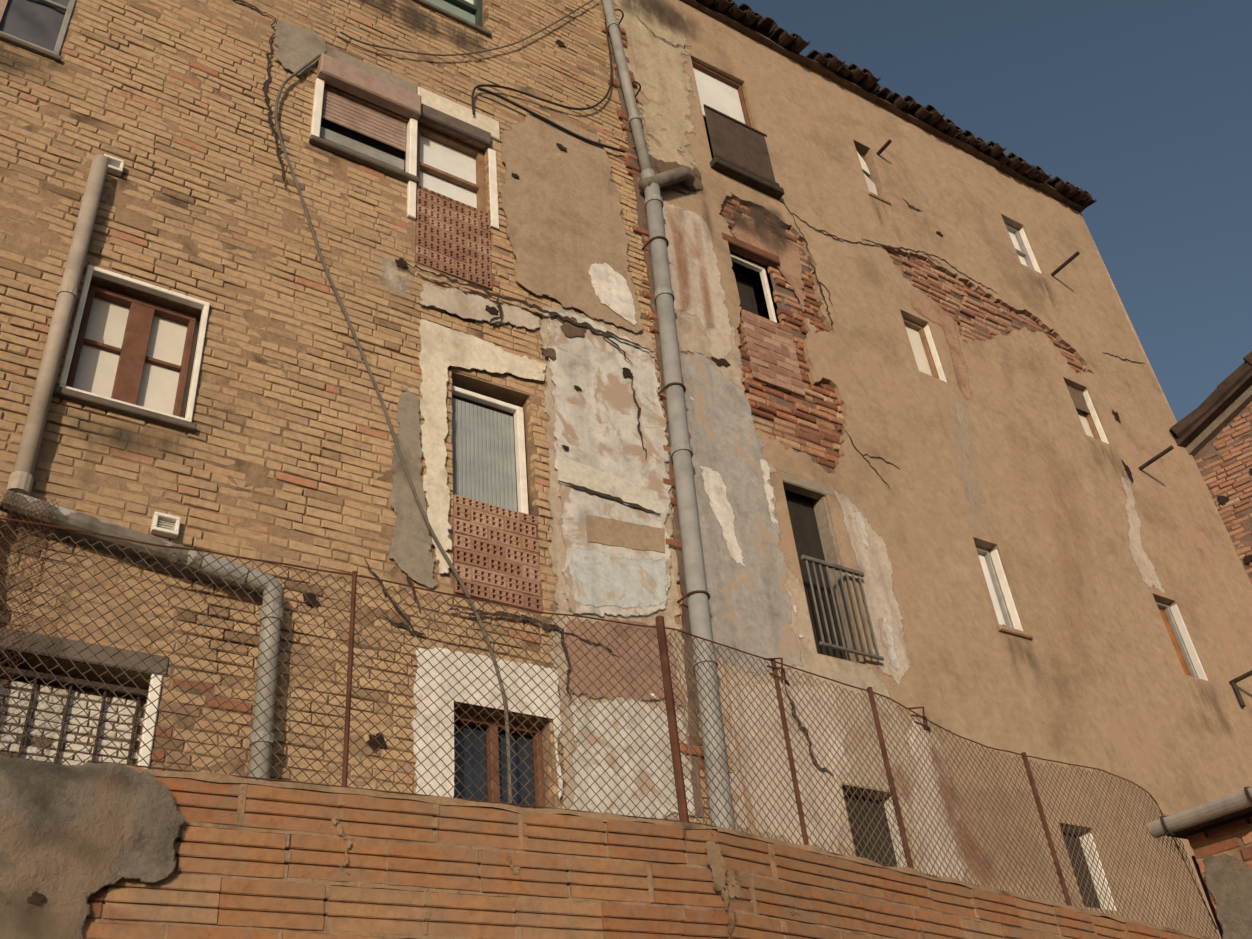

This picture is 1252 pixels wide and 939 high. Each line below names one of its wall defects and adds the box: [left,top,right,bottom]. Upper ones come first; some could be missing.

crack [235,0,291,194]
peeling [412,0,705,823]
peeling [662,198,969,882]
crack [846,431,900,488]
crack [779,200,996,331]
spalling [885,249,1091,414]